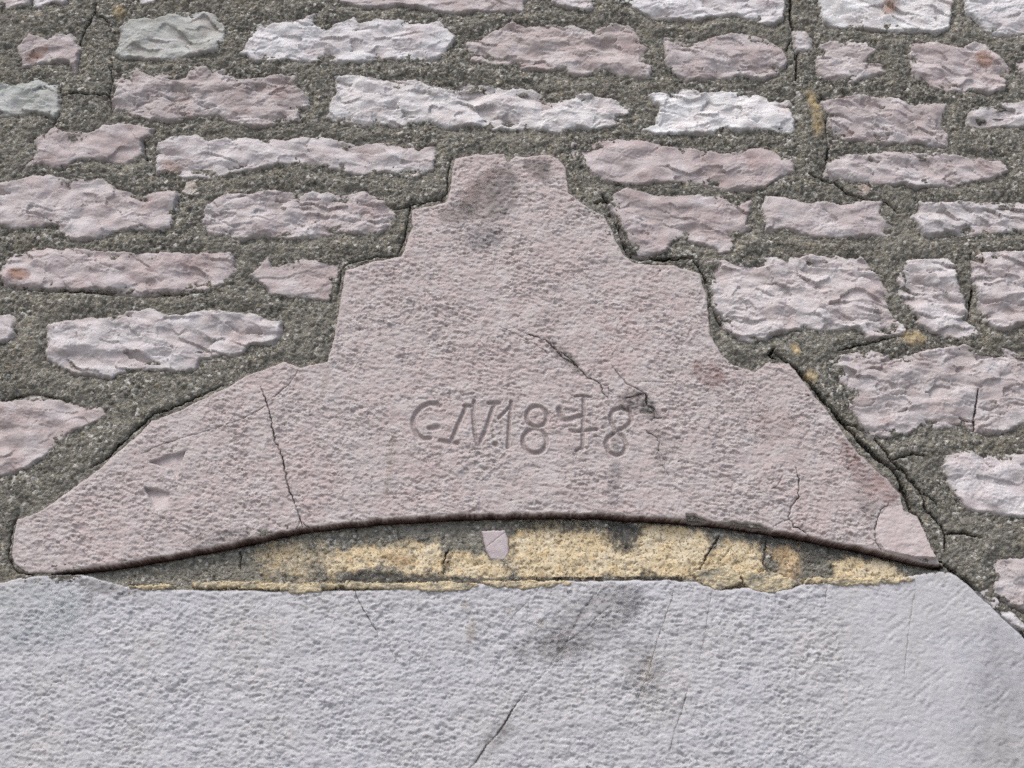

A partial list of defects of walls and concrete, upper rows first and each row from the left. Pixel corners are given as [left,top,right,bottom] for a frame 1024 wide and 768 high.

crack [510,331,662,452]
crack [261,383,312,532]
crack [768,350,976,591]
spalling [877,506,936,557]
peeling [129,583,176,591]
peeling [192,580,571,594]
peeling [692,566,915,594]